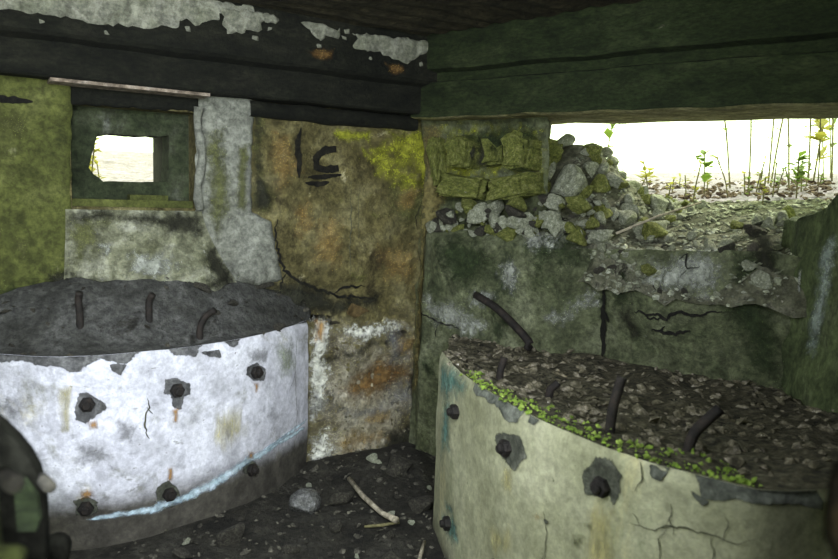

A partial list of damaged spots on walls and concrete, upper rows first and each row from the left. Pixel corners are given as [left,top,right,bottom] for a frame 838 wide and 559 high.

peeling [0,0,279,41]
peeling [301,21,428,66]
crack [274,180,375,299]
spalling [647,257,720,295]
crack [634,310,722,336]
spalling [0,351,144,375]
spalling [165,345,221,358]
spalling [246,362,266,390]
leakage [385,424,410,447]
crack [628,504,755,559]